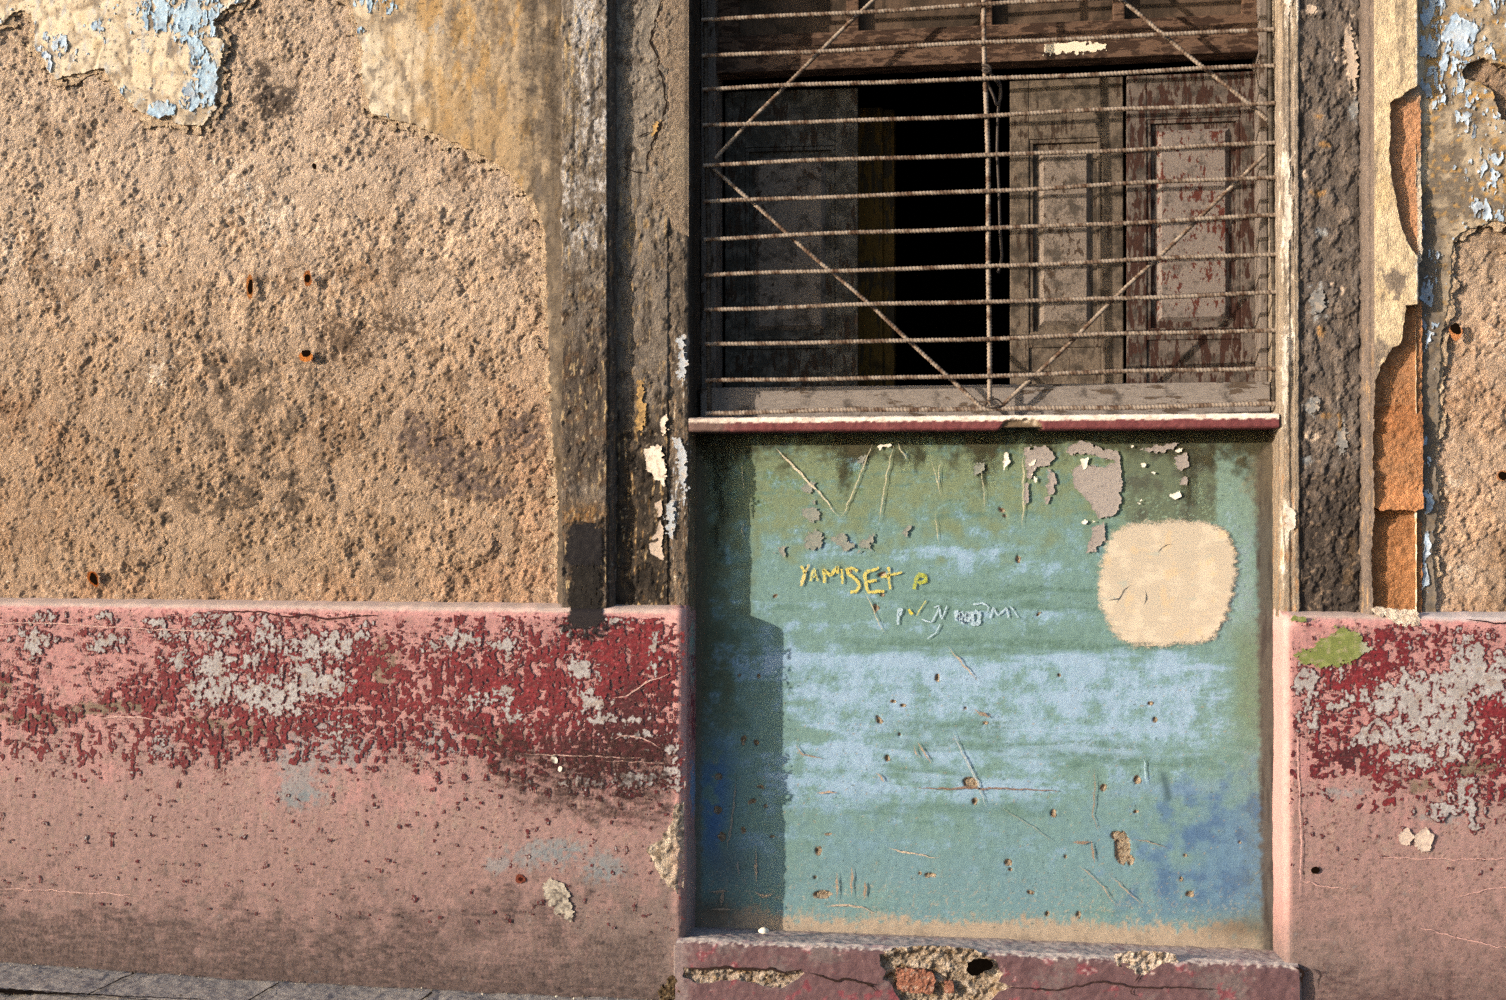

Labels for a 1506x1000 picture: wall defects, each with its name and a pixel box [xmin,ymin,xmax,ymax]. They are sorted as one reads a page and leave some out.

peeling [1284,0,1317,21]
crack [619,0,667,173]
peeling [1283,159,1292,251]
spalling [0,0,690,933]
peeling [801,481,874,573]
peeling [1003,440,1189,553]
peeling [1284,506,1296,533]
spalling [1289,0,1506,876]
crack [0,988,203,1000]
spalling [658,968,804,1000]
crack [684,965,882,992]
spalling [879,945,1010,1000]